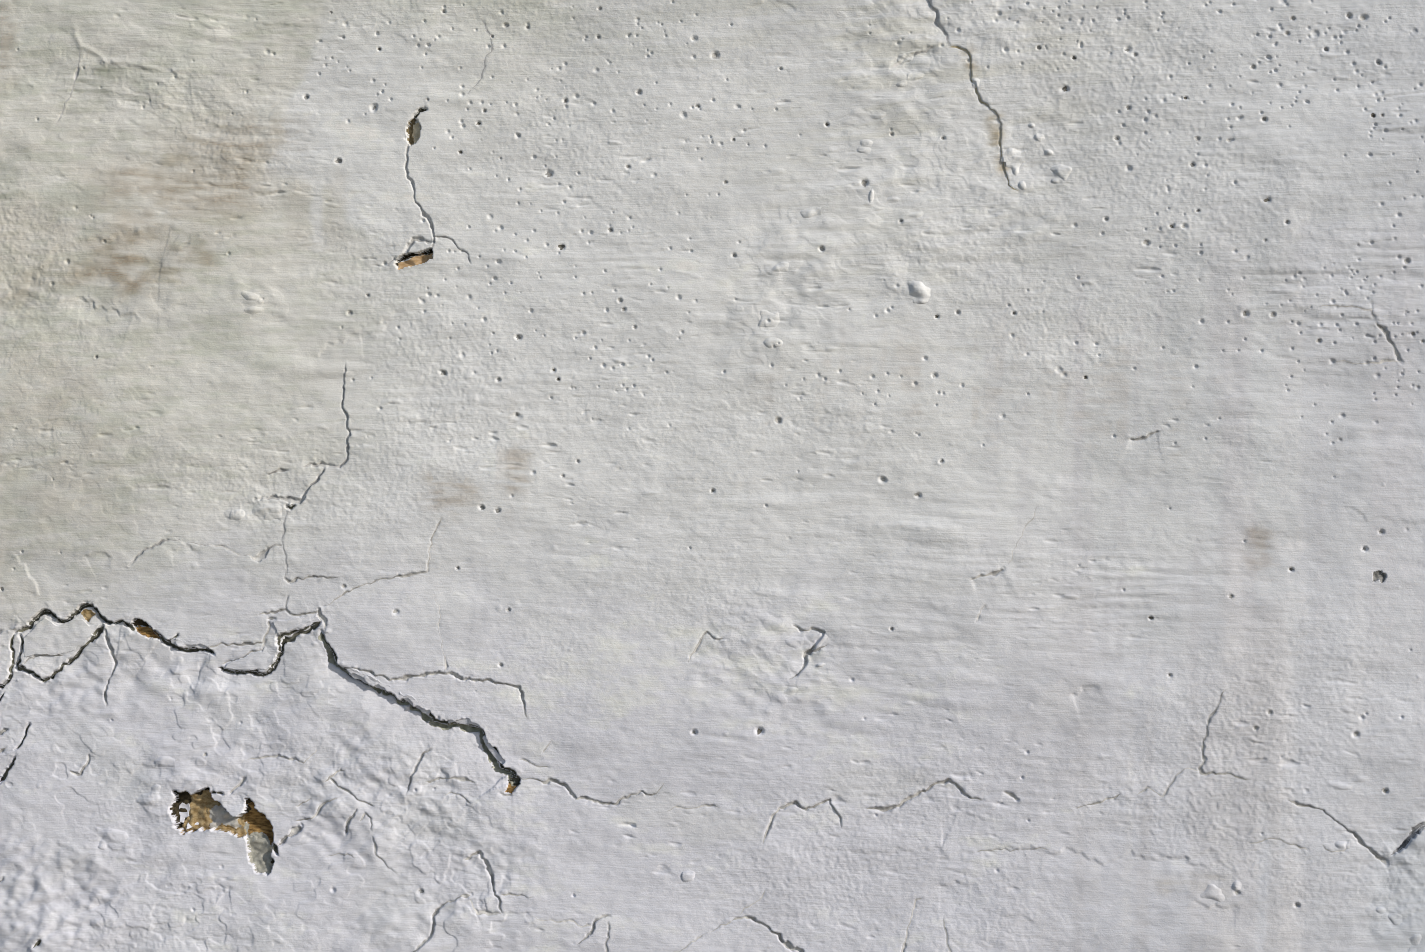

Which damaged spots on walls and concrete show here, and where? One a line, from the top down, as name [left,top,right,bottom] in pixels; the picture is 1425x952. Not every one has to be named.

flaking render [406,118,421,145]
flaking render [396,249,433,270]
crack [0,362,724,812]
flaking render [170,788,275,874]
crack [212,749,397,874]
crack [763,779,1019,843]
crack [978,845,1047,853]
crack [1250,800,1425,864]
crack [413,851,610,952]
crack [674,891,804,952]
crack [901,898,952,952]